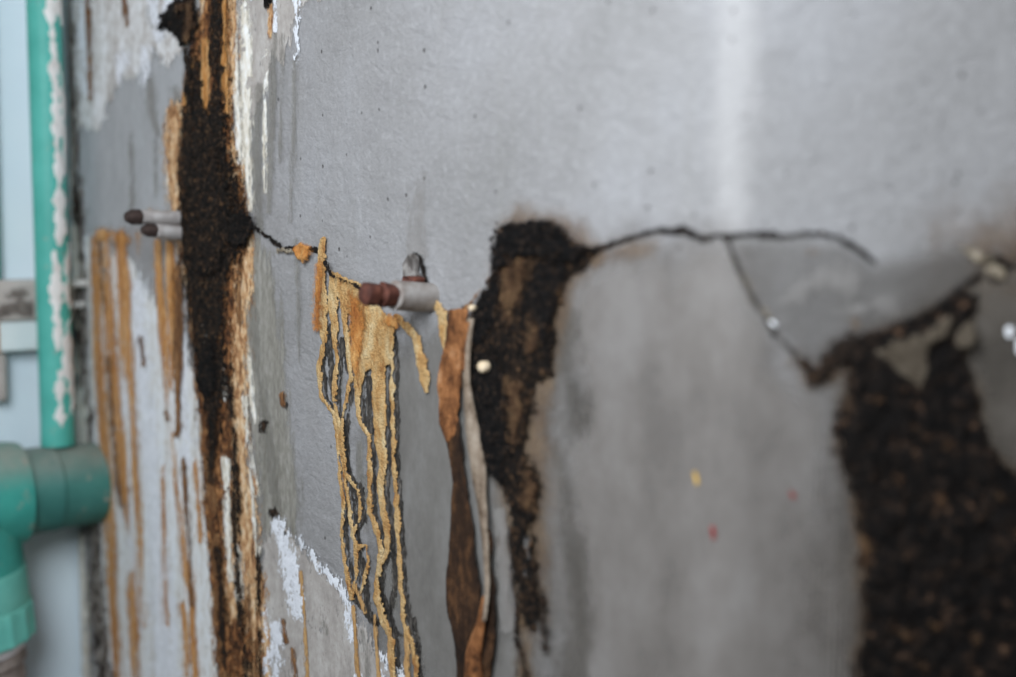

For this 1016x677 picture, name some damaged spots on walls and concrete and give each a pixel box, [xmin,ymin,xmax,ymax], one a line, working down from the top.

damp [239,0,269,212]
peeling [238,0,321,129]
damp [72,185,85,244]
crack [254,226,360,289]
crack [586,225,877,368]
corrosion [90,228,148,677]
damp [361,218,1016,677]
peeling [260,515,405,677]